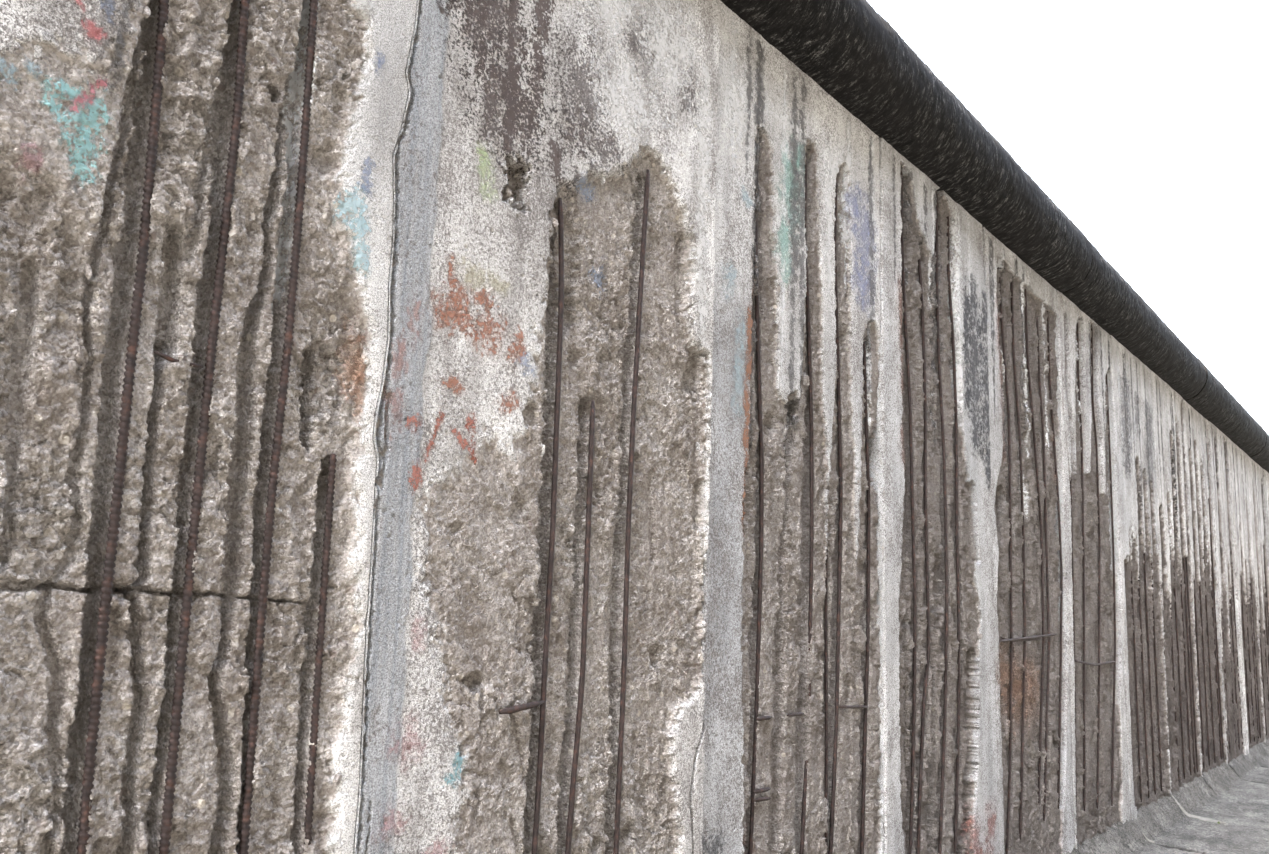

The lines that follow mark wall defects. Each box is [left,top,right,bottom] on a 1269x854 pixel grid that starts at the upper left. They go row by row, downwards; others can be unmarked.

crack [0,576,303,603]
spalling [0,0,379,854]
crack [356,0,424,854]
spalling [406,145,712,854]
spalling [740,125,883,854]
spalling [898,159,983,854]
corrosion [957,804,997,854]
spalling [994,255,1269,854]